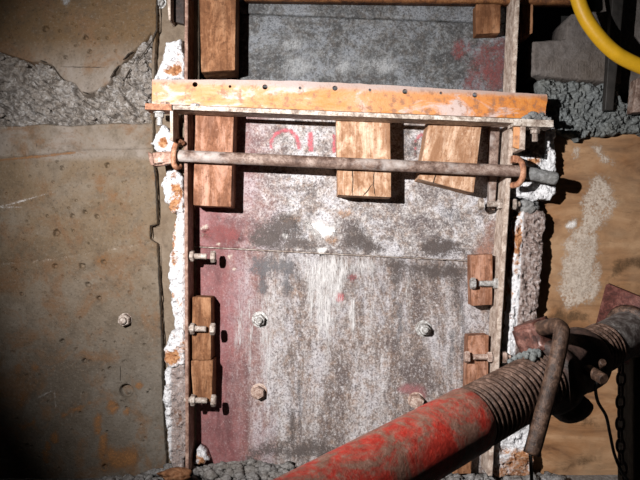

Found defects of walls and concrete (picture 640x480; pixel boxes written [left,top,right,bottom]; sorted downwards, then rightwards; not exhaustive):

spalling [0,35,153,131]
crack [150,166,165,438]